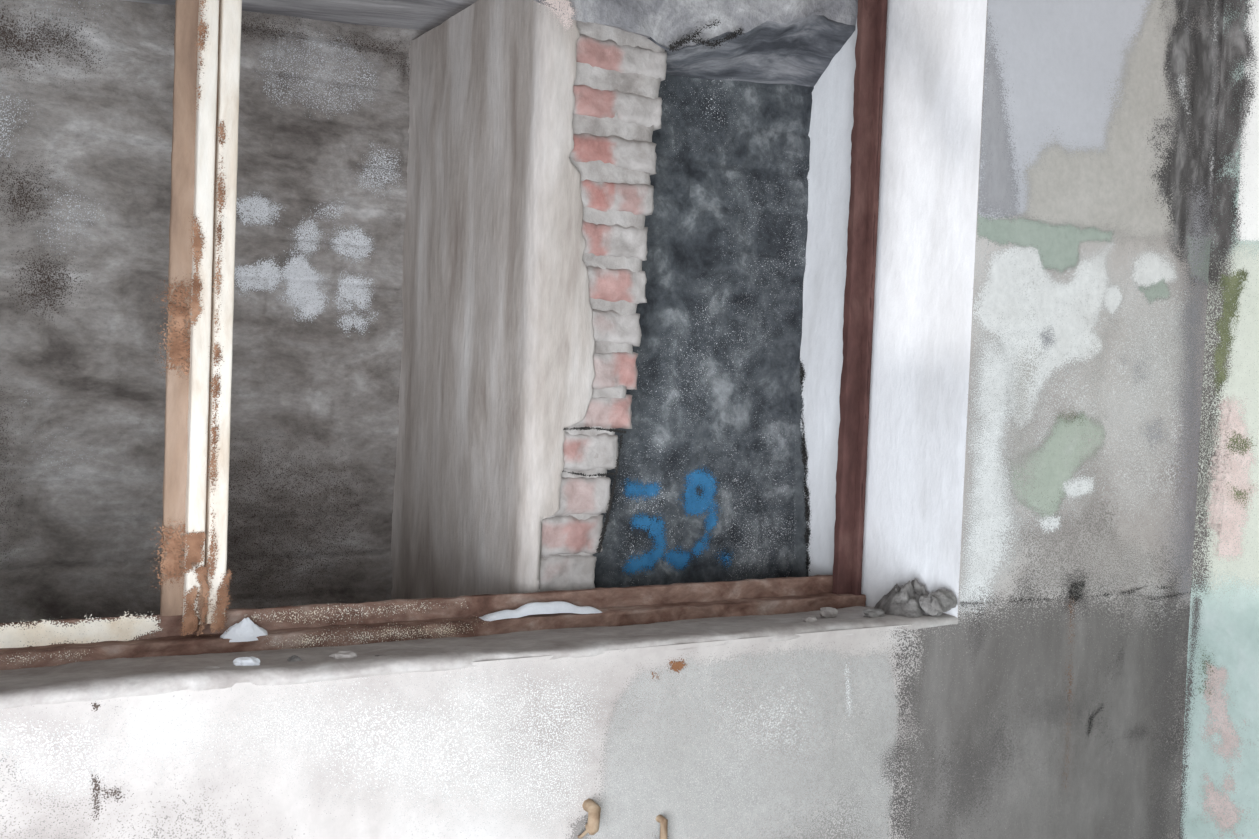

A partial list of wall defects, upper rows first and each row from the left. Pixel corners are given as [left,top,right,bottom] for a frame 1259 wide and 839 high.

rust [194,0,209,109]
rust [150,119,232,637]
leakage [875,0,1259,839]
peeling [955,211,1259,629]
rust [569,815,591,839]
spalling [1056,565,1098,792]
peeling [1192,642,1252,839]